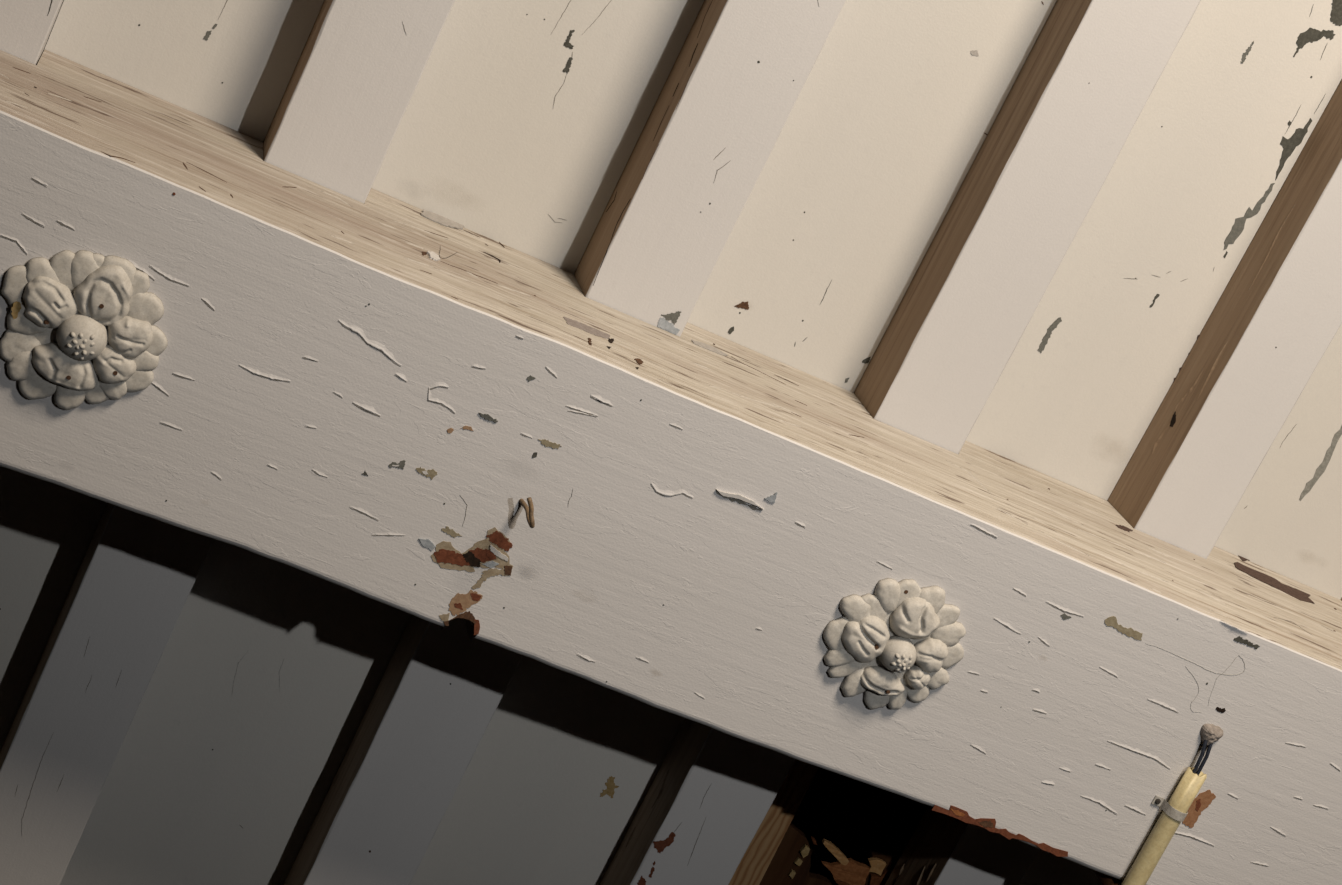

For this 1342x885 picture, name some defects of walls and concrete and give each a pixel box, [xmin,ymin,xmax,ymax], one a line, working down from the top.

peeling [1293,0,1342,57]
peeling [1223,118,1312,258]
peeling [1038,317,1062,353]
peeling [419,526,513,642]
peeling [1104,616,1143,641]
peeling [600,776,619,798]
spalling [932,805,1068,857]
peeling [637,832,676,885]